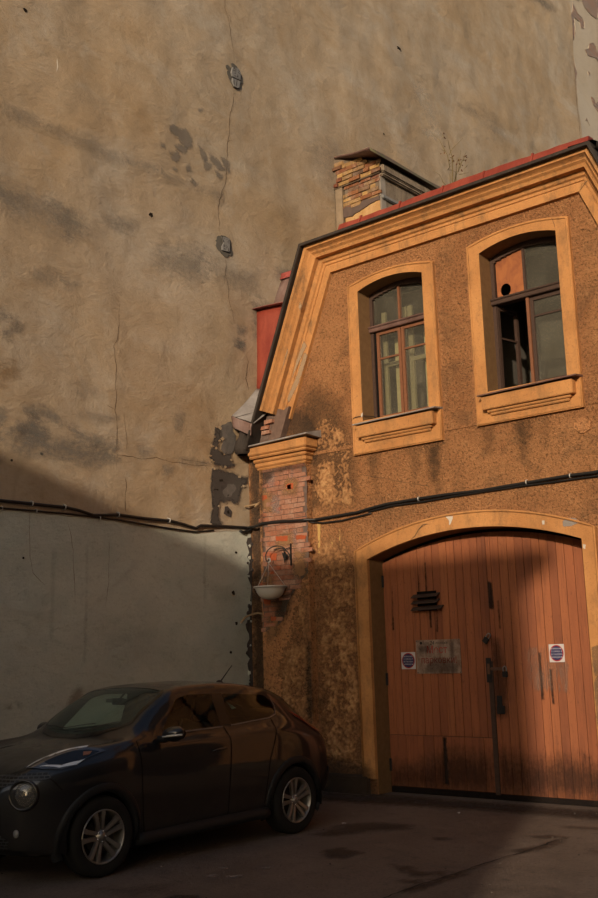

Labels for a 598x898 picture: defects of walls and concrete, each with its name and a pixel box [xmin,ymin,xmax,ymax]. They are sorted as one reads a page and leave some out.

flaking render [571,0,598,40]
flaking render [585,43,598,61]
crack [218,97,234,225]
crack [109,327,210,511]
spalling [208,422,248,525]
peeling [235,413,362,766]
leakage [487,581,501,628]
leakage [539,653,554,704]
leakage [394,738,598,801]